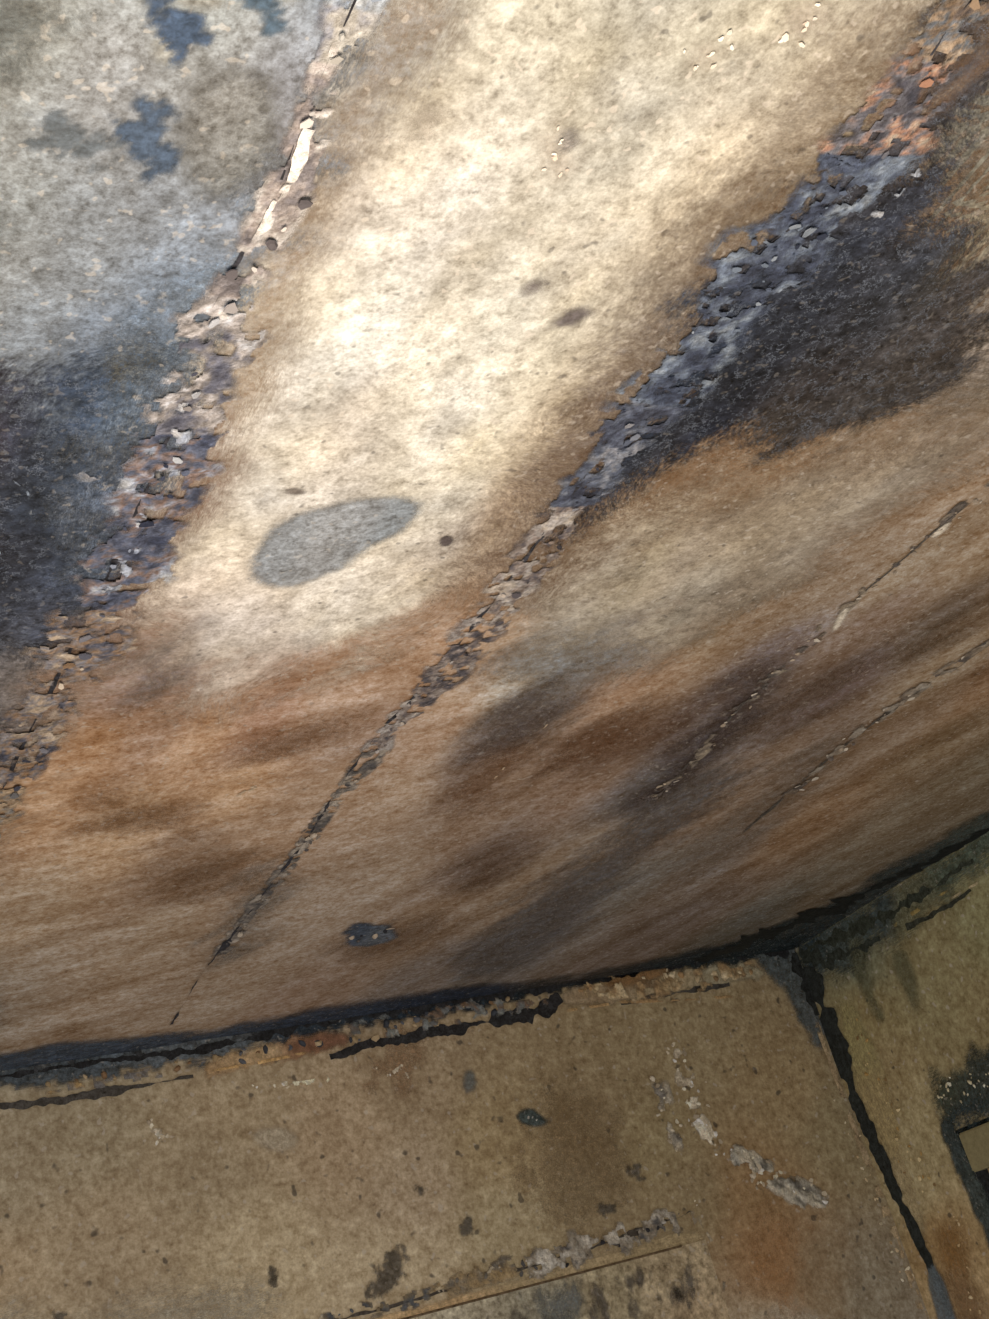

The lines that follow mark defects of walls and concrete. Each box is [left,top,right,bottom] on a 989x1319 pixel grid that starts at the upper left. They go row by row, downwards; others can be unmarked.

peeling [175,67,280,197]
spalling [683,30,734,71]
spalling [778,3,824,48]
damp [0,0,352,440]
rust [147,0,456,552]
crack [0,0,389,838]
crack [170,0,989,1025]
damp [0,435,989,1071]
spalling [174,1016,417,1078]
spalling [563,960,764,1012]
peeling [650,1039,830,1209]
spalling [319,1189,713,1319]